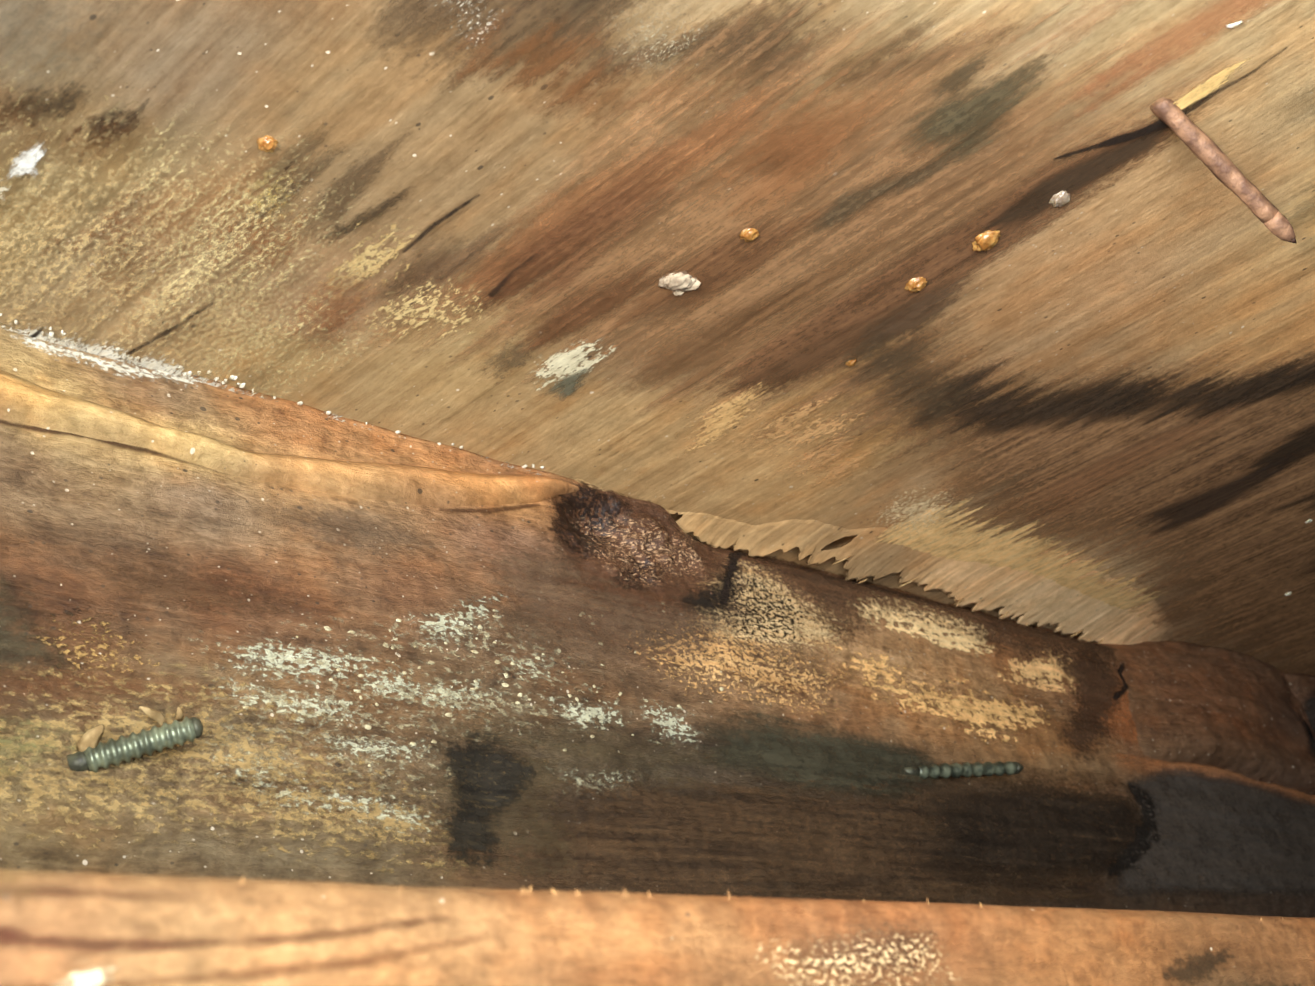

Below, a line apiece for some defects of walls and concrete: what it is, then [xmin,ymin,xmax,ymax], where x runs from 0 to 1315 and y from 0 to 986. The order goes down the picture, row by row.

damp [0,0,1315,676]
crack [0,420,180,461]
crack [440,504,540,512]
damp [0,544,1315,906]
damp [60,967,115,986]
damp [755,930,960,986]
damp [1163,949,1233,984]